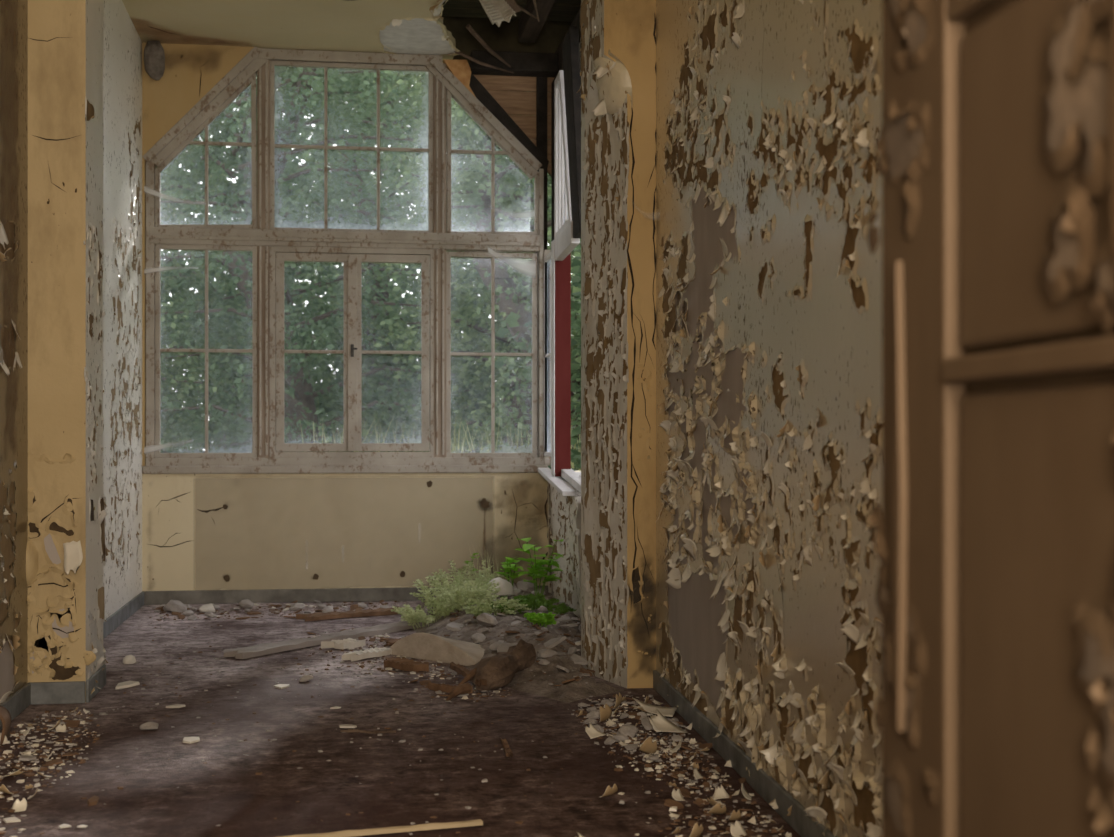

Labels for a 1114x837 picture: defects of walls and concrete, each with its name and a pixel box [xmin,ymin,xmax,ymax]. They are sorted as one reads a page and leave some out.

flaking render [377,0,476,97]
crack [650,13,658,72]
peeling [85,96,95,125]
peeling [0,219,18,263]
peeling [84,106,143,587]
peeling [547,0,645,682]
crack [627,108,656,610]
flaking render [632,0,942,837]
crack [148,492,223,547]
peeling [0,456,109,708]
flaking render [115,681,140,690]
peeling [0,716,97,831]